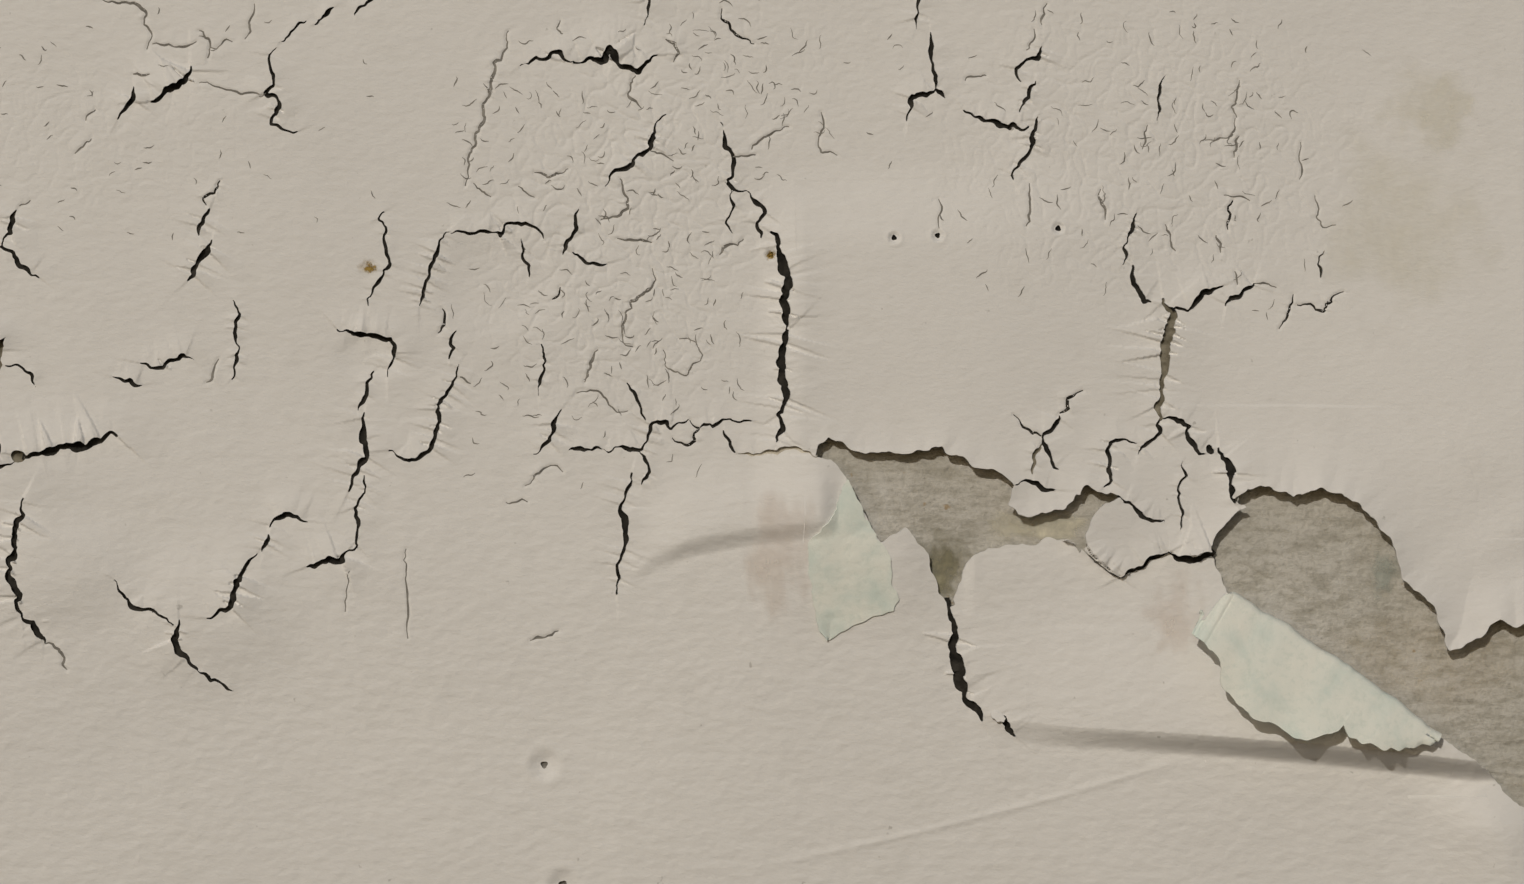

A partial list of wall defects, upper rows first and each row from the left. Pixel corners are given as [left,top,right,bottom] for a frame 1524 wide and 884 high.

crack [75,0,373,154]
crack [906,0,1047,226]
crack [0,431,117,670]
crack [114,300,241,387]
crack [187,180,220,281]
crack [114,512,307,691]
crack [307,0,837,612]
spalling [721,122,793,455]
crack [944,597,1015,736]
crack [1013,390,1083,492]
peeling [808,213,1524,807]
crack [1086,142,1344,578]